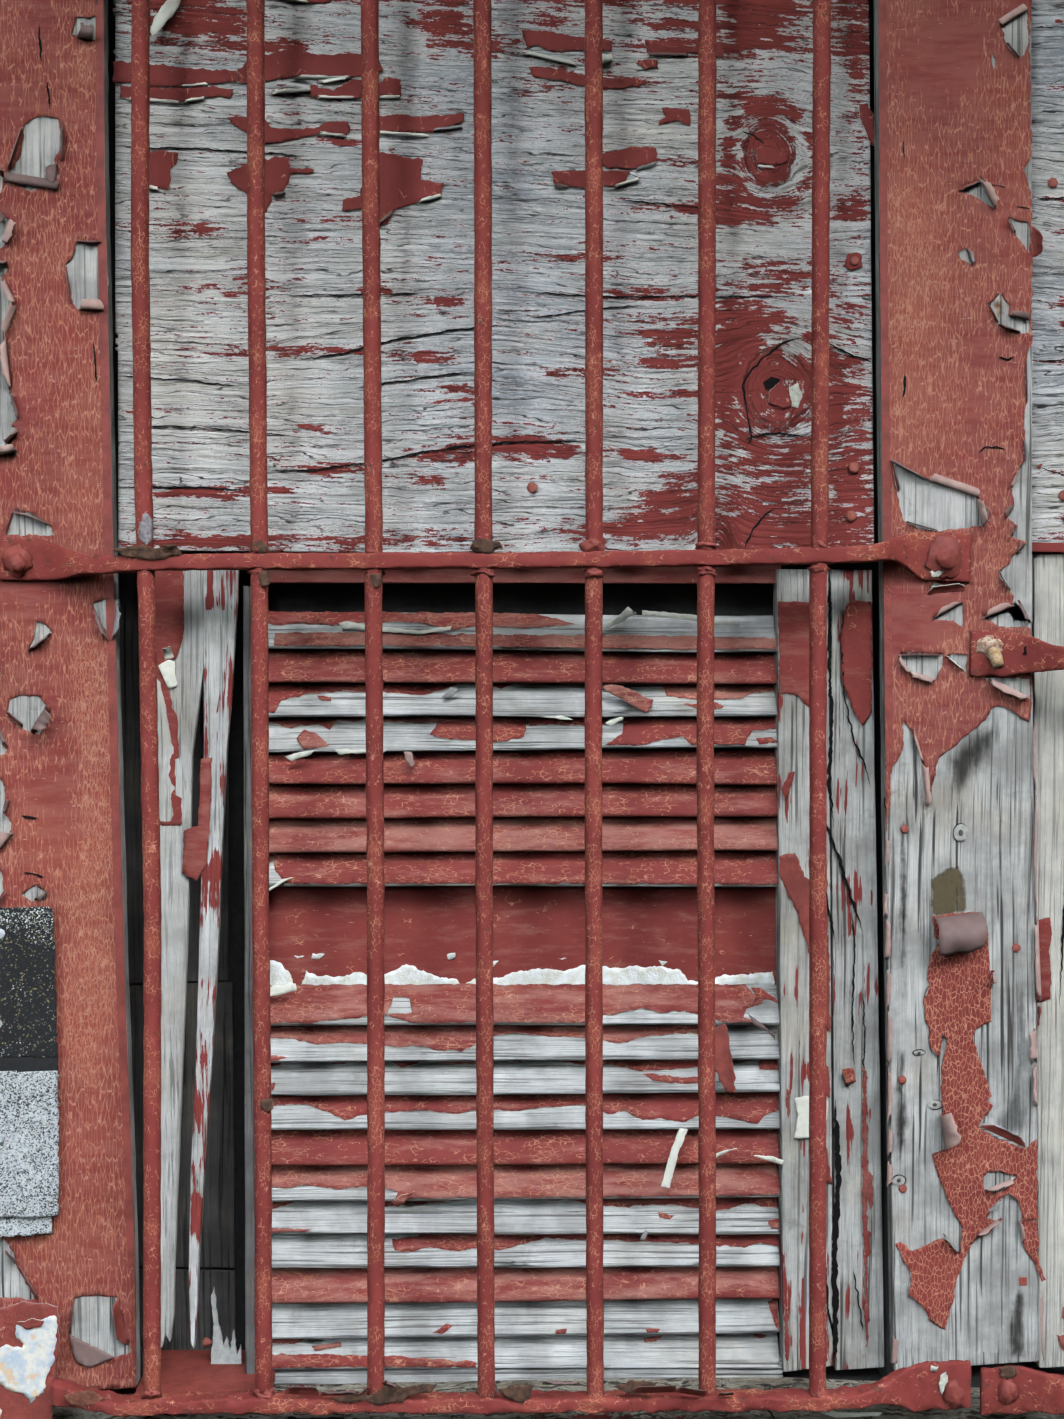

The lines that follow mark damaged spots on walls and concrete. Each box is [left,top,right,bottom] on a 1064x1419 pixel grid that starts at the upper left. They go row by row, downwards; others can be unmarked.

corrosion [114,513,182,560]
corrosion [470,538,503,554]
peeling [383,683,476,769]
peeling [883,677,1046,1365]
peeling [493,1022,586,1127]
peeling [603,1111,699,1265]
peeling [0,1295,130,1404]
corrosion [284,1380,437,1406]
corrosion [494,1381,580,1403]
peeling [384,1299,699,1368]
corrosion [614,1380,734,1397]
corrosion [931,1365,948,1394]